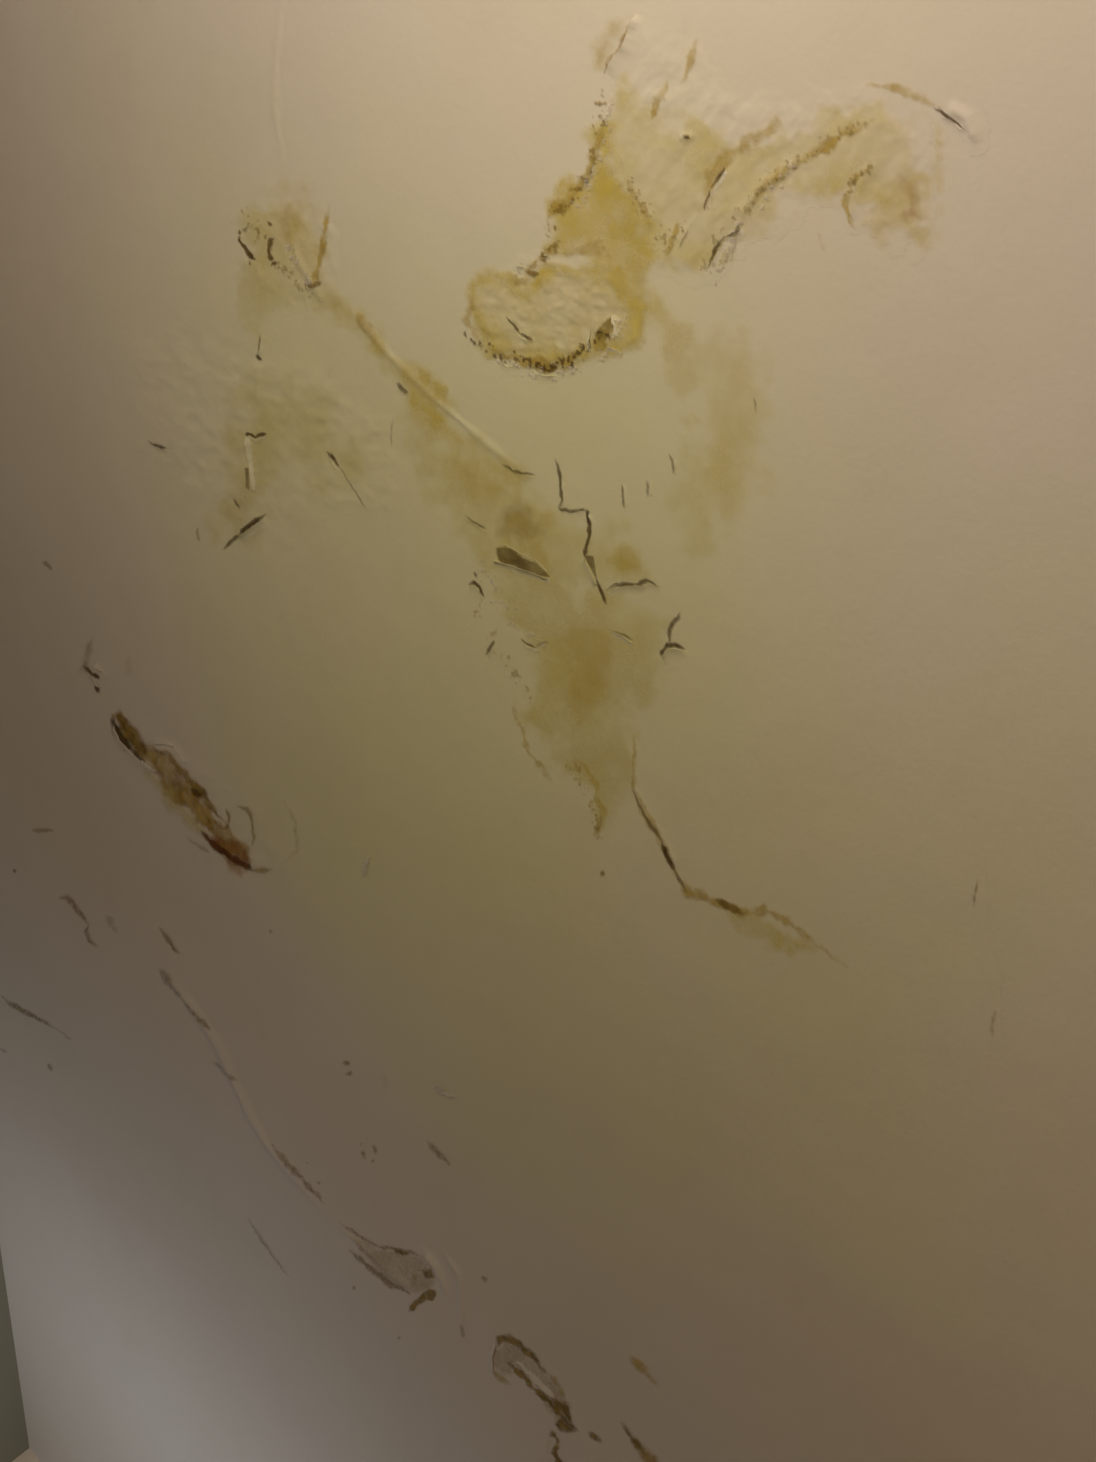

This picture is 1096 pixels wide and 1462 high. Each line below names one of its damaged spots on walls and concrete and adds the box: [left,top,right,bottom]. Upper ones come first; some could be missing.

leakage [238,222,276,264]
leakage [528,124,655,288]
leakage [464,267,657,371]
crack [502,465,536,485]
peeling [466,538,555,610]
peeling [558,466,605,601]
crack [606,579,661,605]
flaking render [105,714,247,855]
crack [634,781,688,869]
flaking render [335,1223,454,1311]
flaking render [482,1336,573,1462]